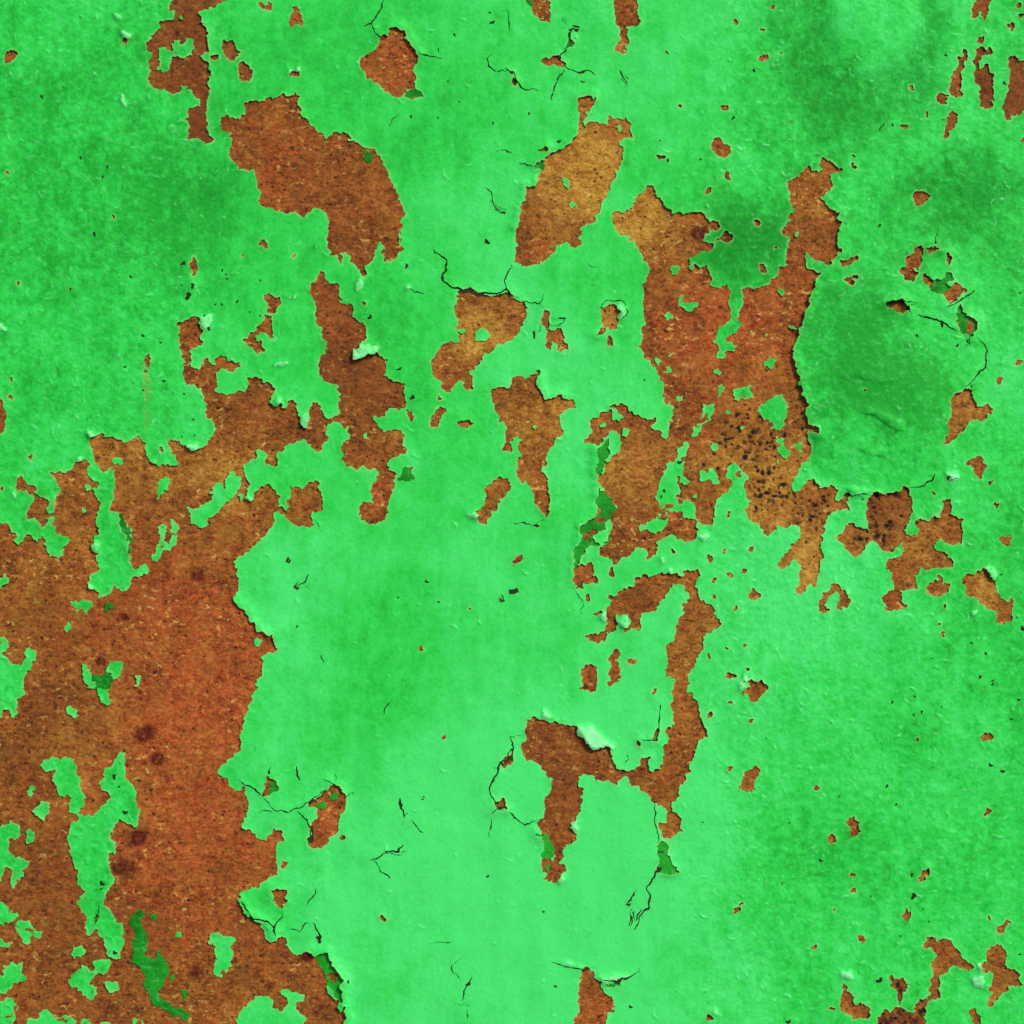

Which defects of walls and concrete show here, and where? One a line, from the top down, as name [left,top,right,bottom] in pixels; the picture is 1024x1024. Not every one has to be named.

crack [487,19,595,100]
crack [408,247,566,339]
crack [885,290,988,390]
rust [0,0,424,1024]
rust [502,96,1013,884]
crack [240,766,354,843]
crack [489,735,544,836]
crack [239,888,322,938]
crack [627,801,664,930]